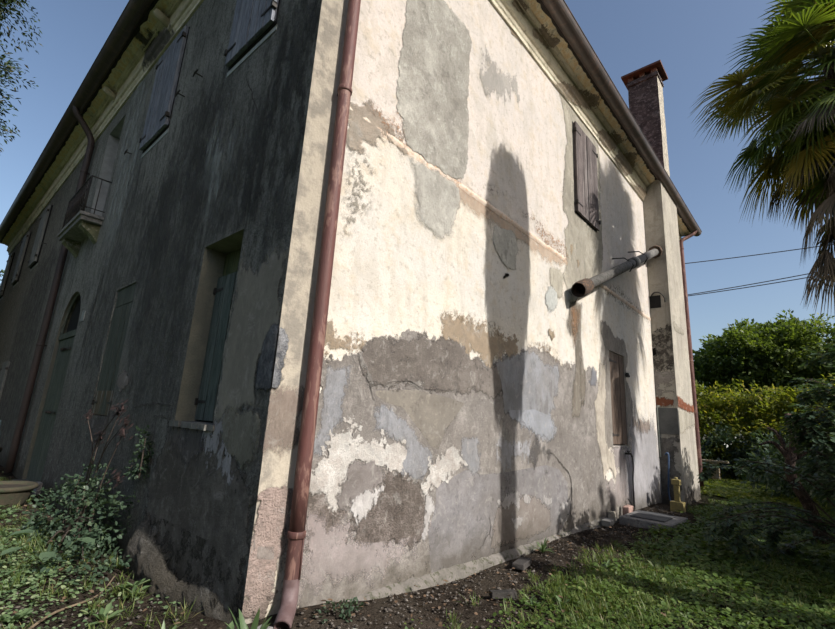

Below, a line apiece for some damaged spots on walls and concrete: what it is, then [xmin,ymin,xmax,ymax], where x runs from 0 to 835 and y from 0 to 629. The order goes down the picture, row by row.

peeling [480,49,520,102]
flaking render [346,0,472,238]
water stain [83,0,319,402]
flaking render [493,225,518,278]
peeling [524,214,580,268]
flaking render [256,324,289,391]
water stain [168,426,213,469]
water stain [263,386,305,452]
flaking render [297,313,620,608]
flaking render [144,414,293,626]
water stain [297,514,416,608]